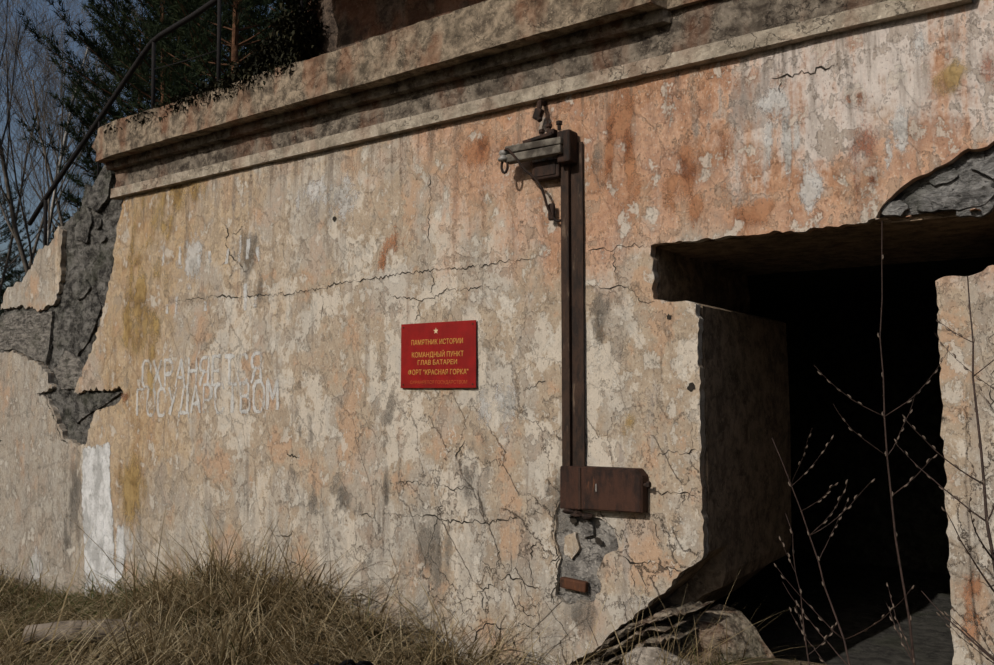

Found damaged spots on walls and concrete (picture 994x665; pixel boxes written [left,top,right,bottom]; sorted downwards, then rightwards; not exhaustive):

crack [772,65,834,94]
spalling [879,145,994,218]
crack [168,170,547,323]
spalling [0,165,124,445]
crack [360,441,560,648]
spalling [556,506,619,604]
crack [617,526,683,586]